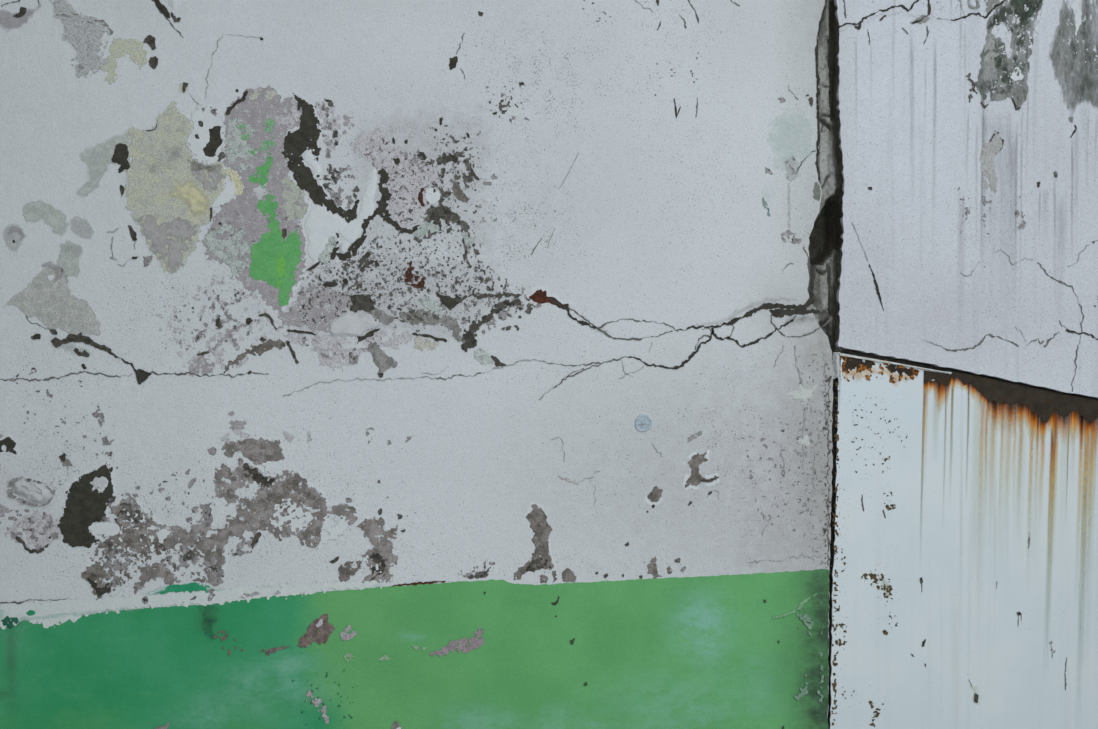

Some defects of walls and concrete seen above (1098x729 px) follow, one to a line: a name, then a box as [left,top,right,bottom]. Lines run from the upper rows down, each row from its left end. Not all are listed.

peeling [48,0,158,84]
crack [779,0,1005,201]
peeling [966,0,1047,110]
peeling [1051,0,1098,137]
peeling [78,33,571,378]
crack [0,330,268,385]
peeling [0,411,446,604]
peeling [512,501,576,583]
crack [283,248,832,568]
peeling [683,431,720,506]
rust [830,354,1098,726]
crack [922,240,1098,392]